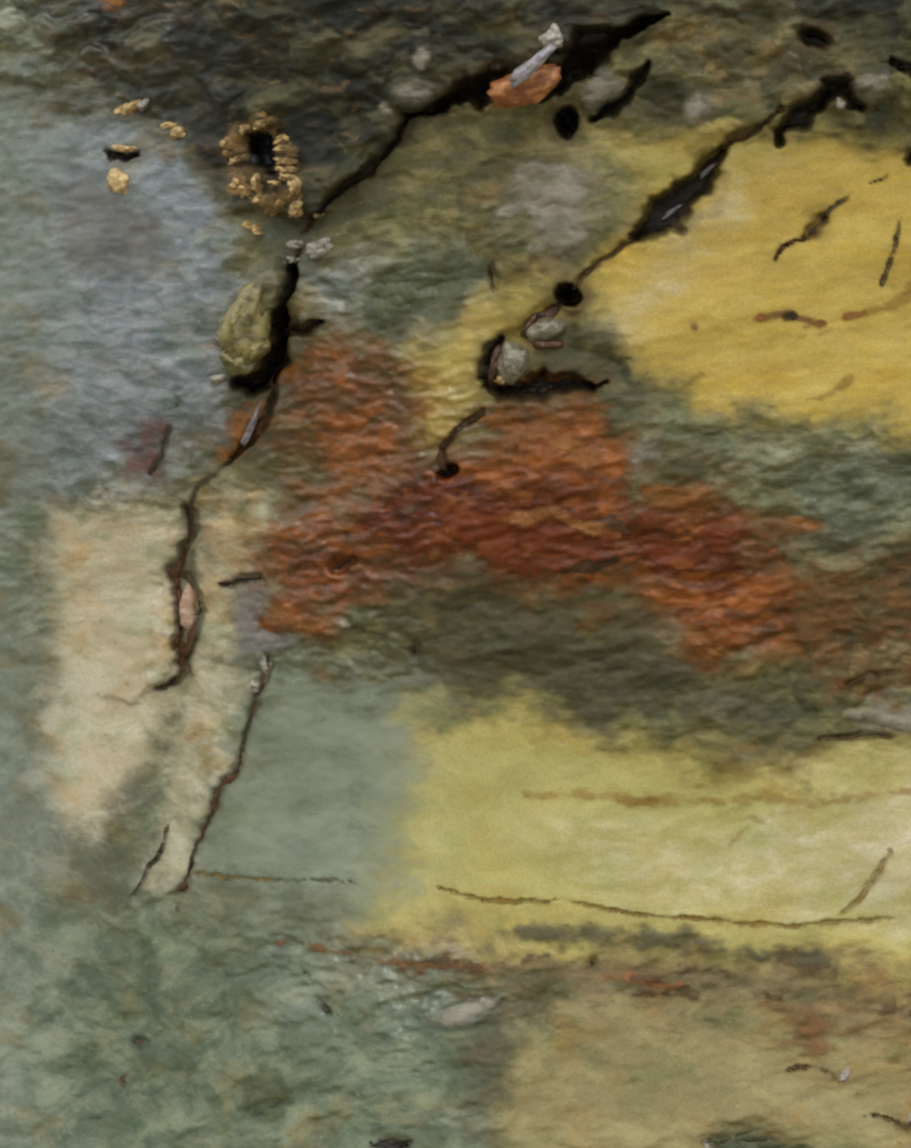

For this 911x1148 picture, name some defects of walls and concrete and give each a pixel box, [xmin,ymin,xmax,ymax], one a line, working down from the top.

leakage [414,49,429,69]
leakage [585,73,620,104]
crack [550,13,668,93]
spalling [220,111,324,235]
peeling [286,236,333,264]
crack [546,76,863,313]
crack [155,73,507,691]
crack [438,336,608,472]
rust [252,344,911,717]
leakage [233,590,293,663]
crack [176,656,269,910]
leakage [208,667,416,923]